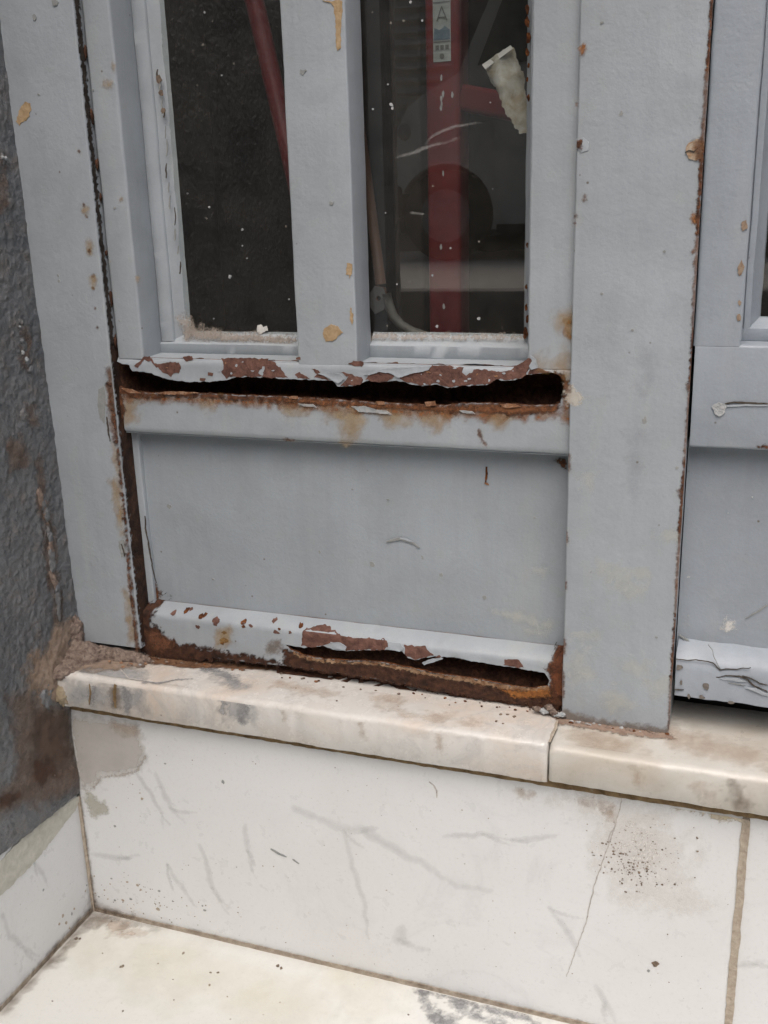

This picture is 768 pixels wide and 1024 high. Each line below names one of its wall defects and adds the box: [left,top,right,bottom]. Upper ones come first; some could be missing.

peeling [16,102,31,126]
peeling [685,139,704,160]
peeling [323,308,353,341]
spalling [118,355,565,415]
corrosion [667,0,713,730]
corrosion [97,344,582,719]
peeling [170,607,229,645]
crack [566,798,622,977]